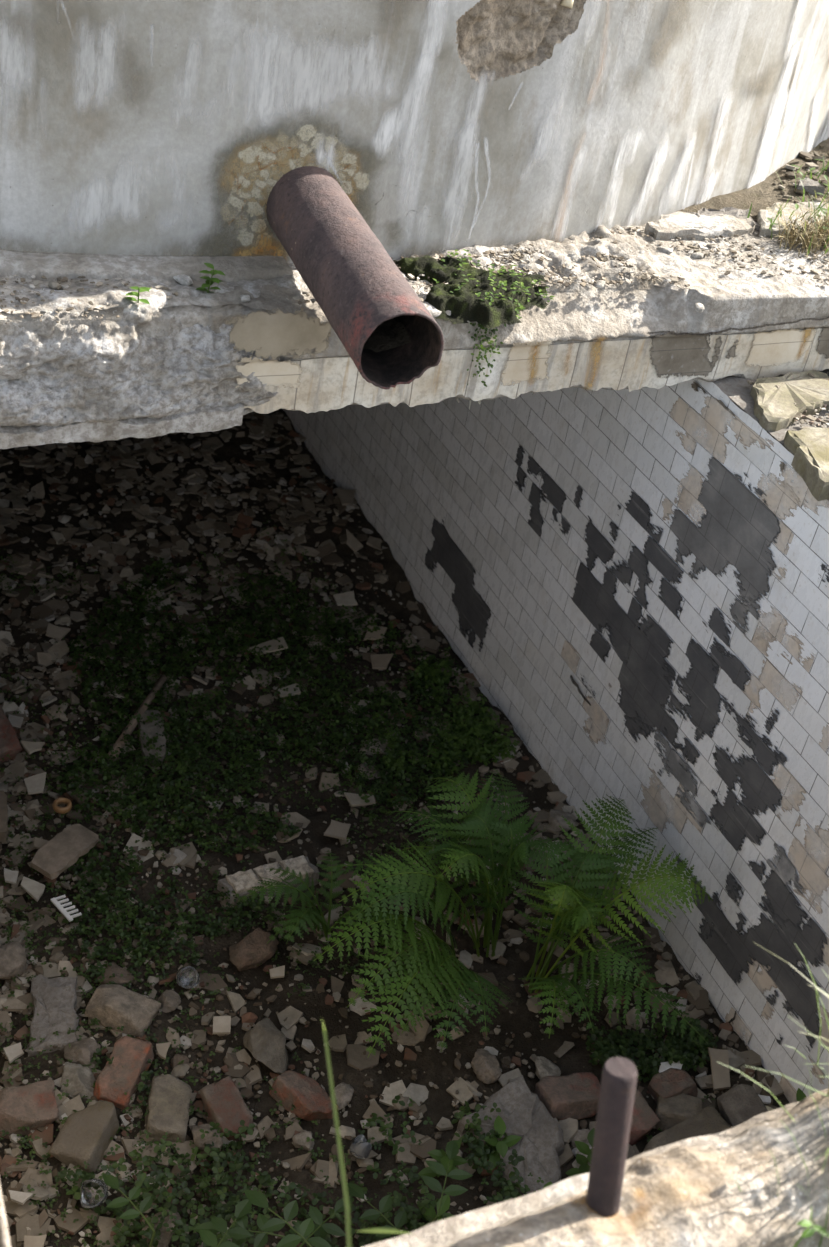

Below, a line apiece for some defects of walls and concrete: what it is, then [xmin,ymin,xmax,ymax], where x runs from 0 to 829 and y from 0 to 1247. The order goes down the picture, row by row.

spalling [455,0,586,86]
spalling [0,263,332,428]
peeling [501,340,554,386]
peeling [425,518,491,652]
peeling [515,326,829,1084]